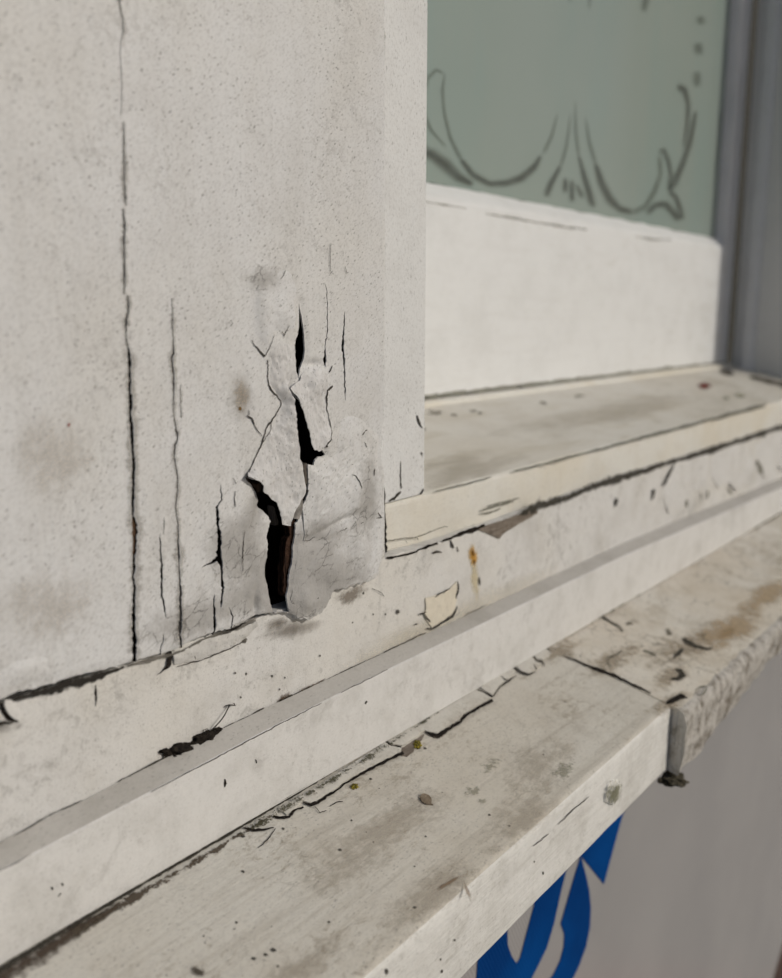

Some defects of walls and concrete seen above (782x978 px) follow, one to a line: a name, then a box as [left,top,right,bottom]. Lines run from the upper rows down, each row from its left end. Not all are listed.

crack [122,142,289,674]
peeling [662,431,782,513]
peeling [423,582,457,627]
corrosion [469,547,481,588]
peeling [278,649,552,816]
crack [425,616,713,738]